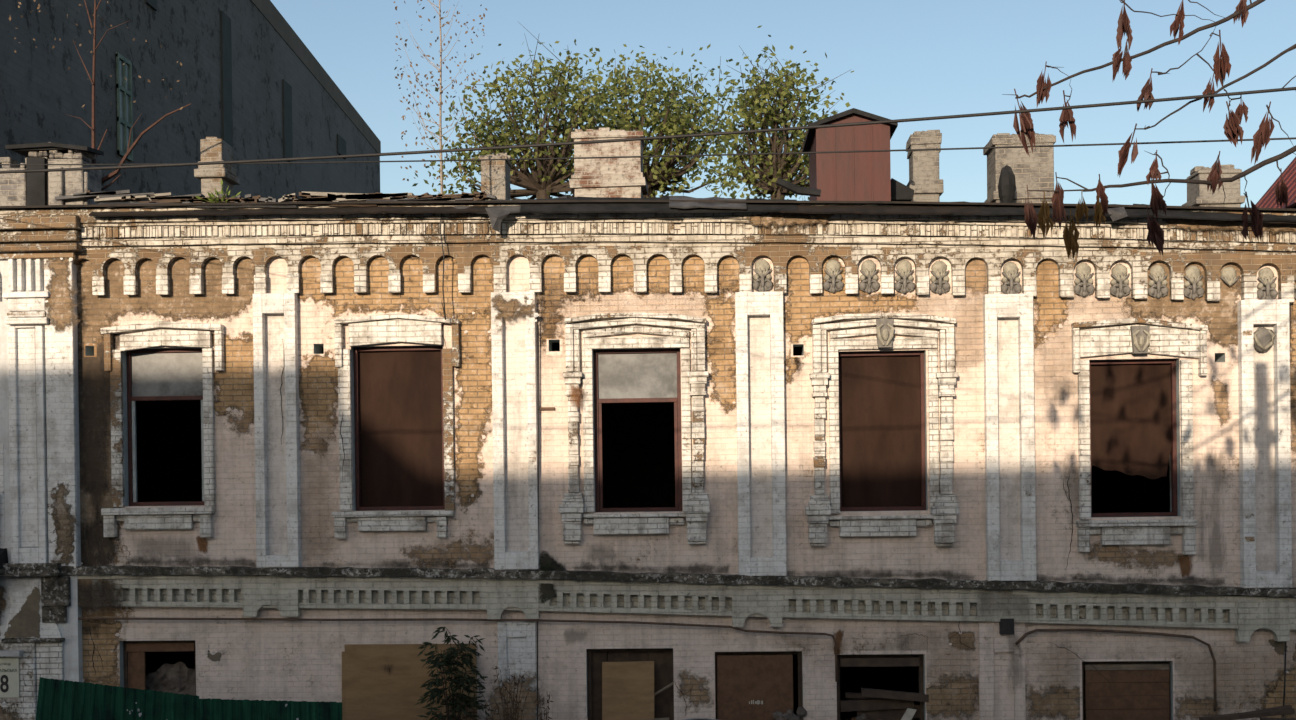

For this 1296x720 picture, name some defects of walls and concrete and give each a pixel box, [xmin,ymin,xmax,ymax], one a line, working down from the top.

peeling [41,257,255,433]
peeling [298,255,752,513]
spalling [1211,376,1231,425]
peeling [47,409,121,565]
damp [78,333,123,634]
peeling [1088,542,1180,573]
spalling [0,581,41,658]
peeling [0,701,23,720]
peeling [679,671,710,707]
peeling [926,674,979,719]
peeling [1256,639,1296,720]